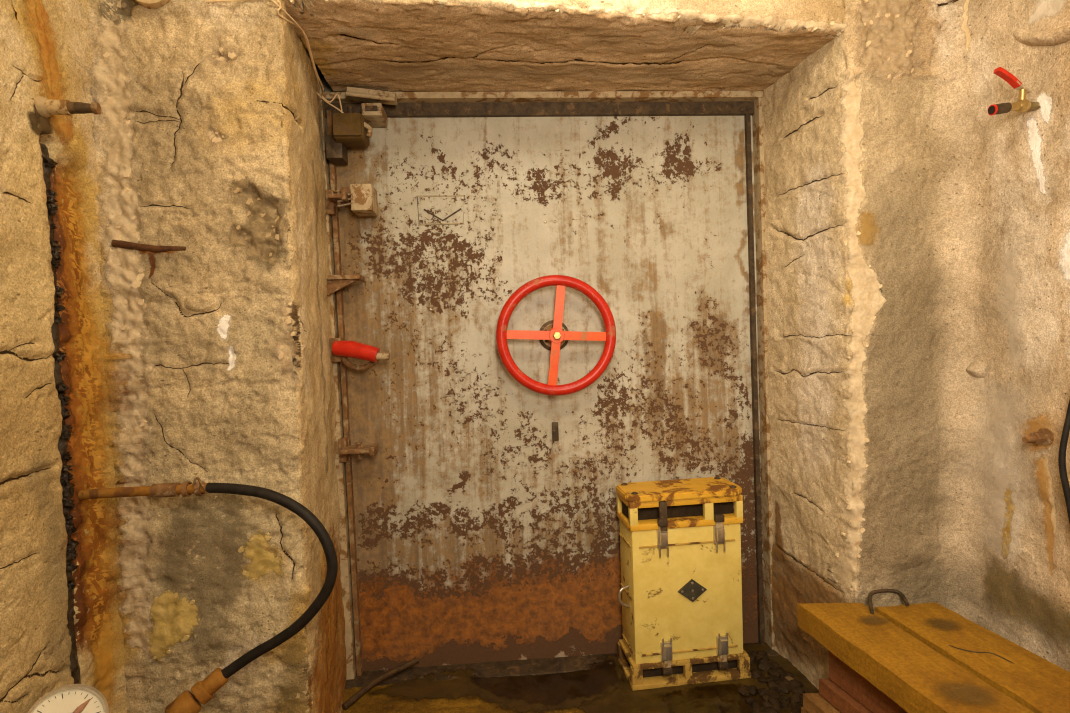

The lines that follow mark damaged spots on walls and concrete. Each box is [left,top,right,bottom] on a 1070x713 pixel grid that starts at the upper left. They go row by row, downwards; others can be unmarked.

corrosion [26,0,63,100]
corrosion [49,115,73,143]
water stain [1025,93,1052,194]
peeling [434,0,925,592]
water stain [1059,229,1070,280]
crack [0,343,51,398]
crack [0,467,51,485]
corrosion [1025,417,1054,571]
corrosion [308,527,347,713]